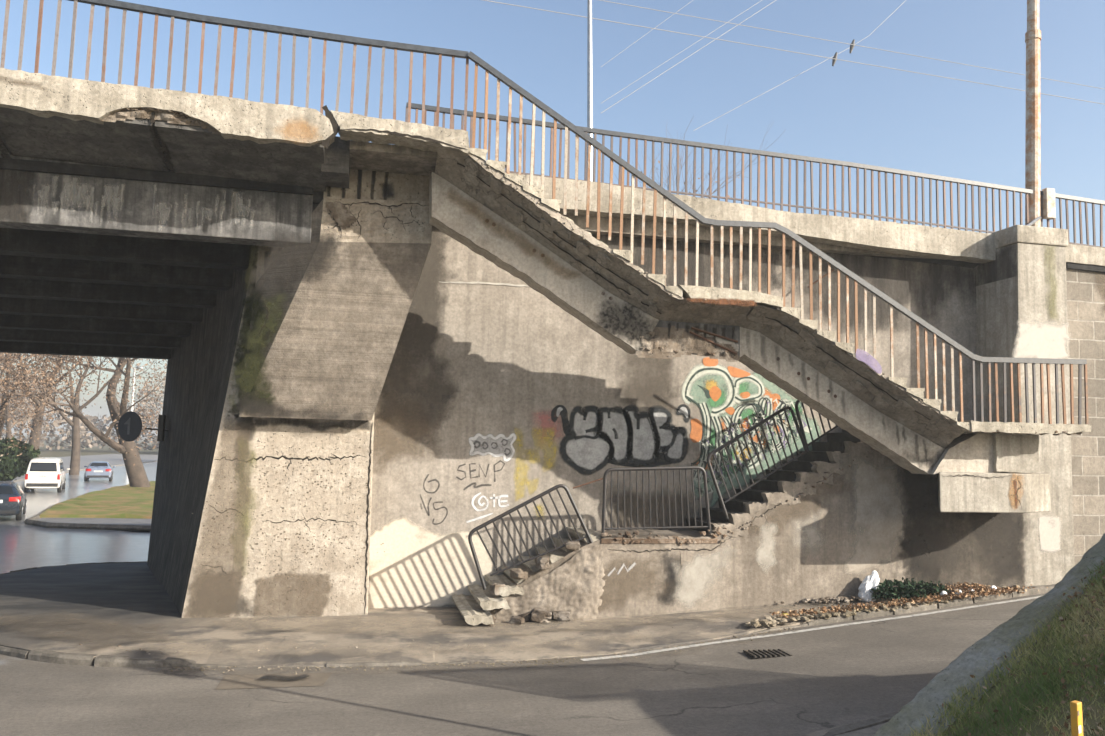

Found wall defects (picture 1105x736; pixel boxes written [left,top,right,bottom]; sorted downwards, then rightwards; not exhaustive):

spalling [102,108,222,135]
crack [321,105,662,314]
spalling [340,124,647,275]
leakage [223,226,458,472]
spalling [629,288,739,362]
leakage [190,485,330,618]
crack [208,427,372,614]
spalling [489,447,904,623]
leakage [897,431,944,468]
corrosion [1010,475,1020,508]